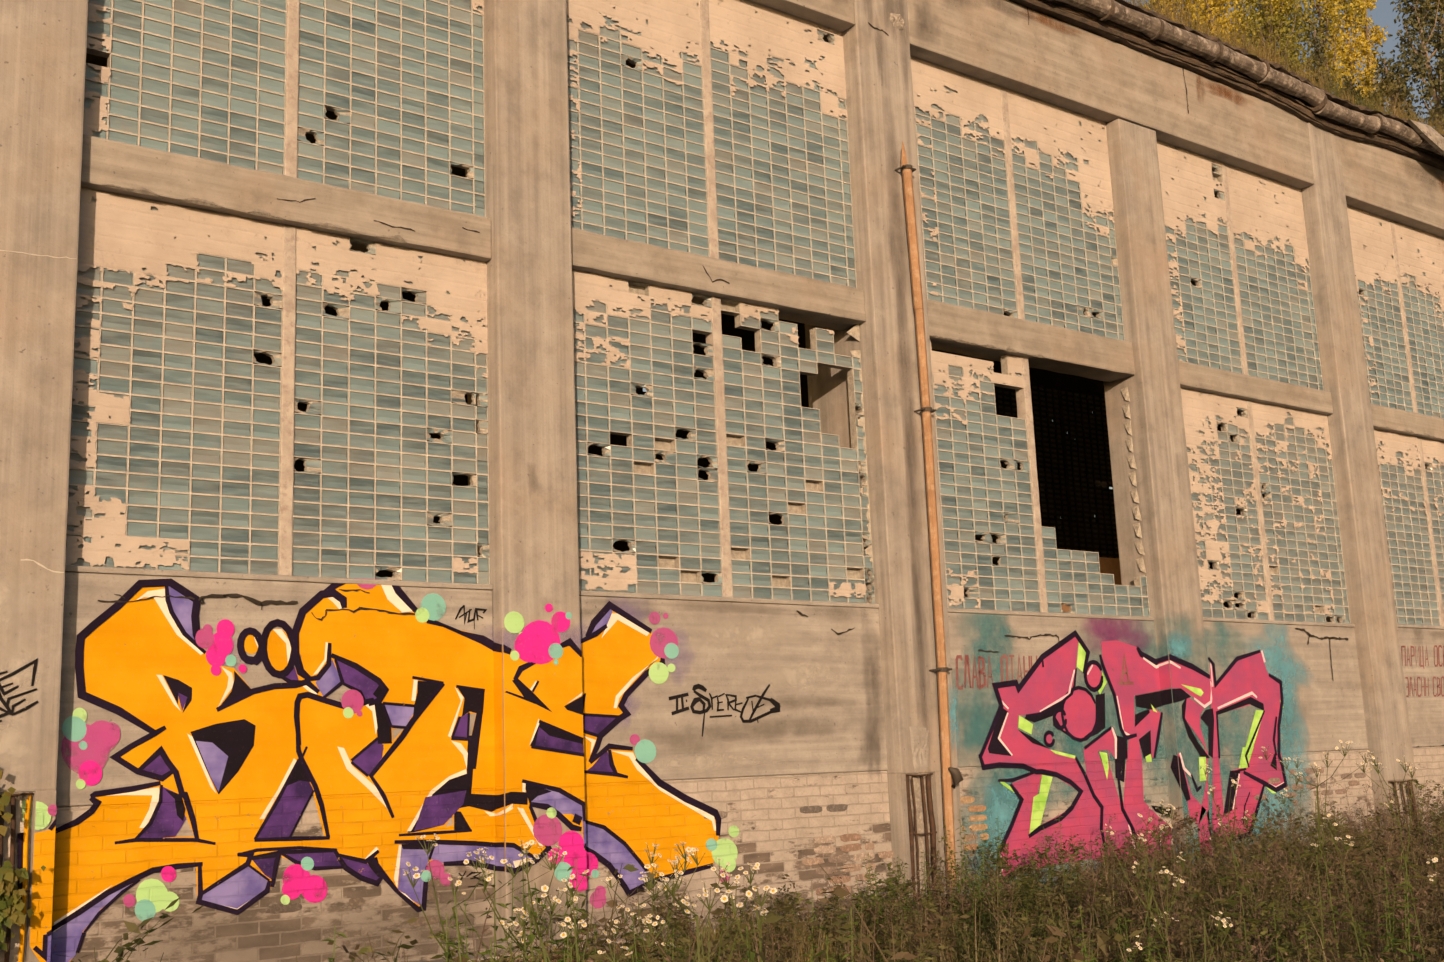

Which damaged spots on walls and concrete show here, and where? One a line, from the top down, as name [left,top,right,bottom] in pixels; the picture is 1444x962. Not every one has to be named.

peeling [83,1,113,136]
peeling [566,0,847,120]
peeling [910,56,1115,241]
peeling [65,184,488,570]
peeling [572,270,713,369]
peeling [930,335,1045,425]
peeling [1157,140,1310,362]
peeling [1347,205,1444,395]
peeling [1181,388,1335,615]
peeling [1374,426,1444,516]
peeling [578,551,638,592]
peeling [829,582,866,598]